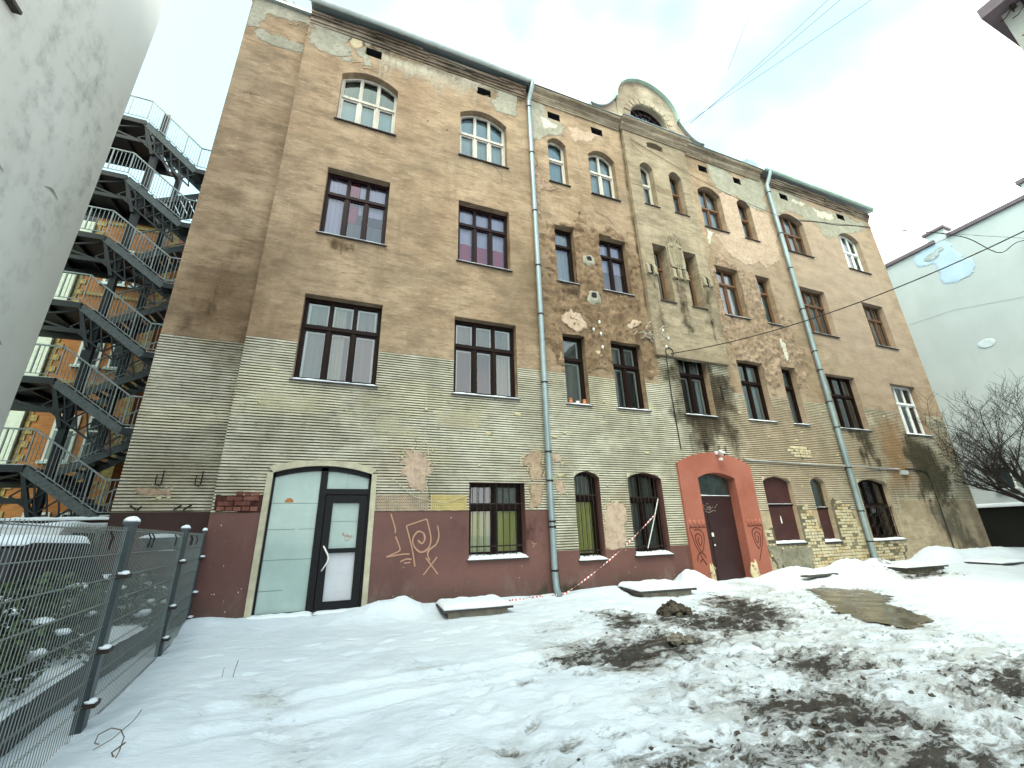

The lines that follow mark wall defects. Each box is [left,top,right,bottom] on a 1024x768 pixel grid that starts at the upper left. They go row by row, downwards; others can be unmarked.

spalling [247,0,373,69]
spalling [489,90,665,381]
spalling [706,163,866,395]
flaking render [214,491,264,513]
spalling [397,446,436,493]
spalling [520,449,568,509]
spalling [602,499,628,551]
flaking render [787,446,812,460]
flaking render [765,498,908,568]